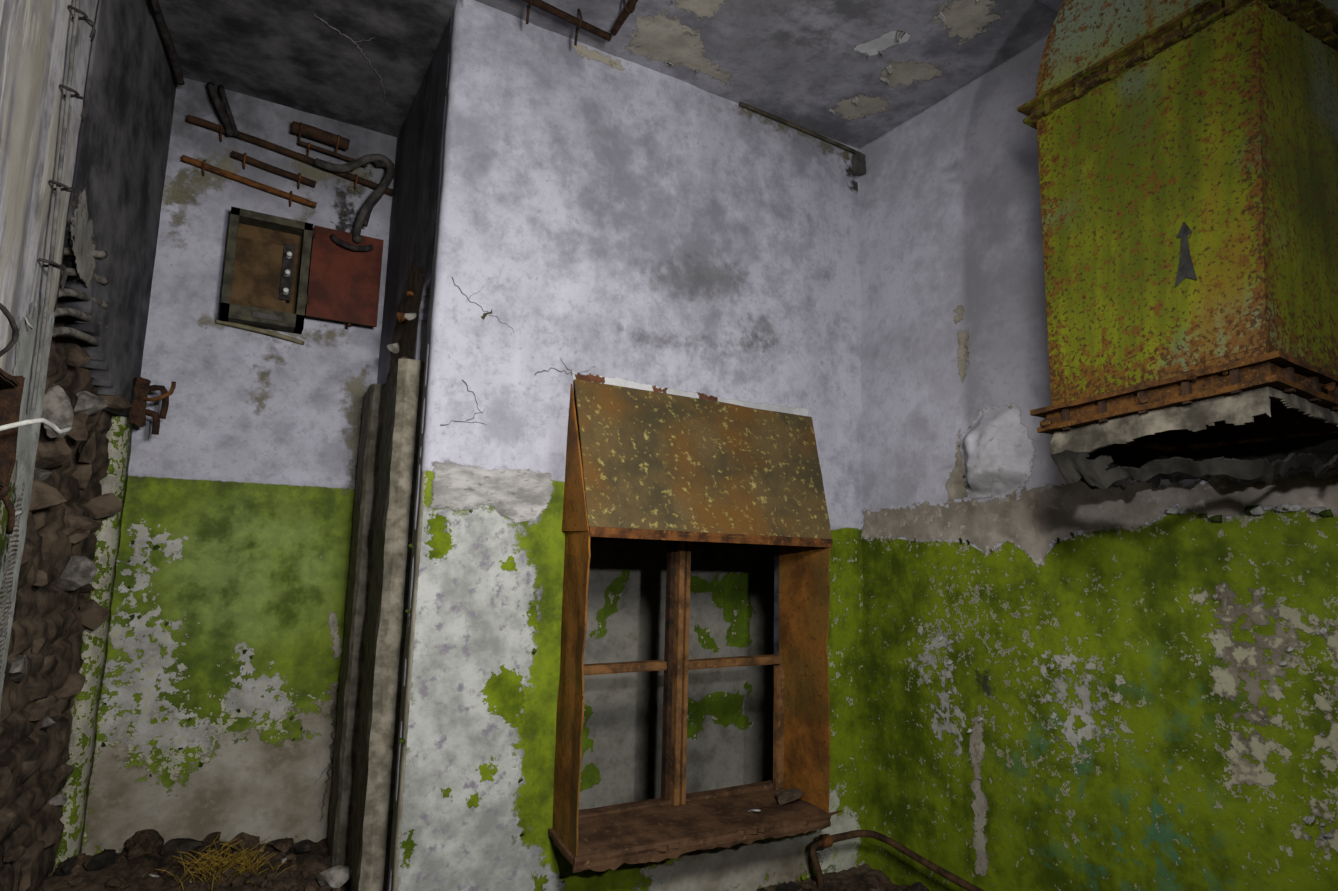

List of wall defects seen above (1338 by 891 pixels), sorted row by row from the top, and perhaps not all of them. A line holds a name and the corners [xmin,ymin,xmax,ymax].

peeling [571,0,733,85]
peeling [825,30,948,121]
peeling [930,0,1008,46]
peeling [0,190,339,856]
spalling [861,430,1338,566]
peeling [328,611,343,658]
peeling [397,504,566,891]
peeling [907,619,990,876]
peeling [1032,649,1134,774]
peeling [1188,542,1338,871]
spalling [0,763,74,891]
peeling [619,782,861,891]